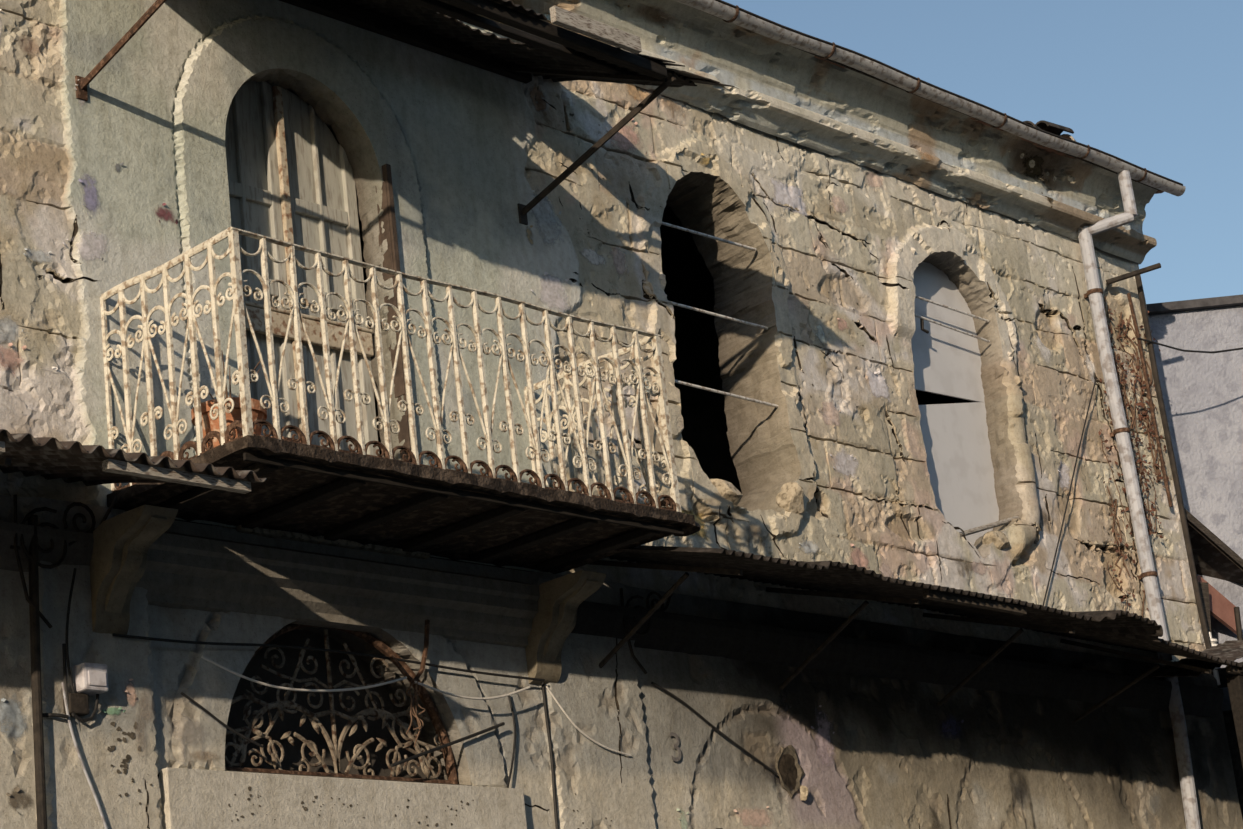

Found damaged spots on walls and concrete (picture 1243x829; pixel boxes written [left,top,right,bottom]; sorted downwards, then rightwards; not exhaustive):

crack [0,254,8,309]
crack [38,215,97,283]
crack [591,280,675,319]
crack [629,184,649,211]
crack [745,160,907,289]
crack [793,319,894,518]
crack [987,282,1051,524]
crack [862,411,980,580]
crack [614,639,622,783]